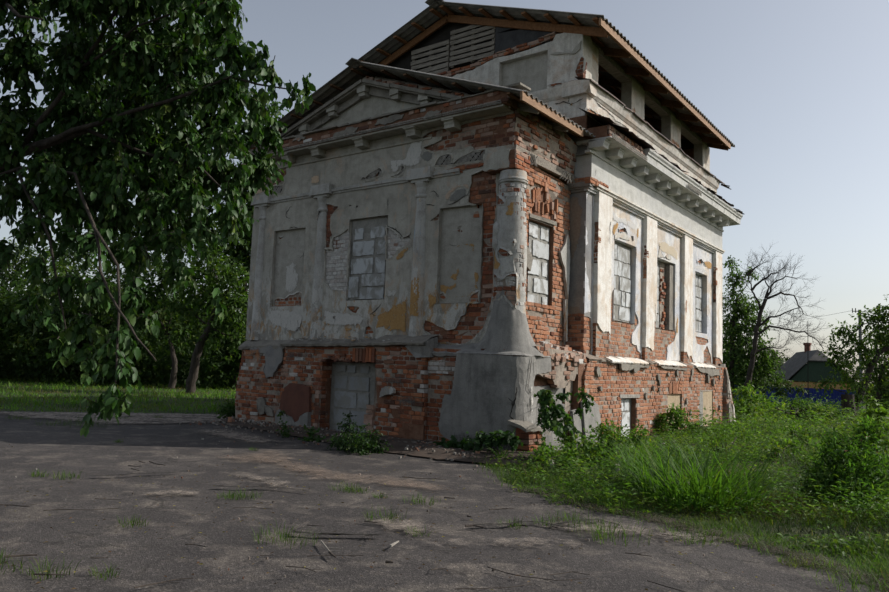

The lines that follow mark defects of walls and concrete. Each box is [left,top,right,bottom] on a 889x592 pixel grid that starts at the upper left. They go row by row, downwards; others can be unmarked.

flaking render [323,202,351,292]
flaking render [422,114,519,344]
spalling [530,177,559,223]
flaking render [614,226,634,241]
spalling [696,257,718,303]
flaking render [427,360,456,375]
spalling [535,254,675,416]
flaking render [696,337,734,422]